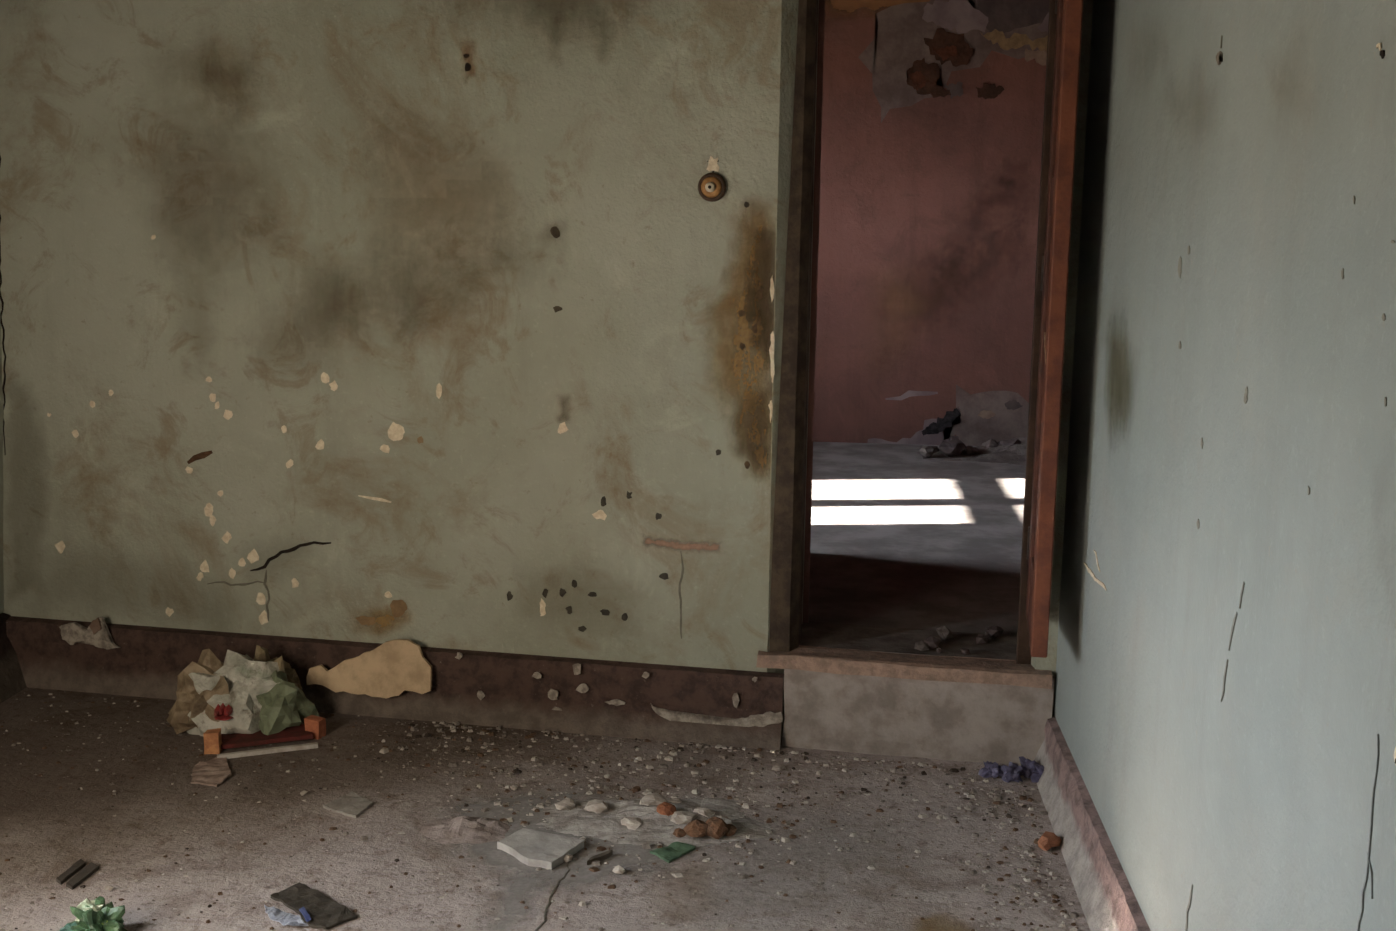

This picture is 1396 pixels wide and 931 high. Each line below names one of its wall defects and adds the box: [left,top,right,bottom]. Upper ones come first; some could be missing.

peeling [858,0,1050,123]
crack [0,214,8,455]
peeling [867,385,1029,446]
crack [208,541,331,621]
crack [1357,734,1379,931]